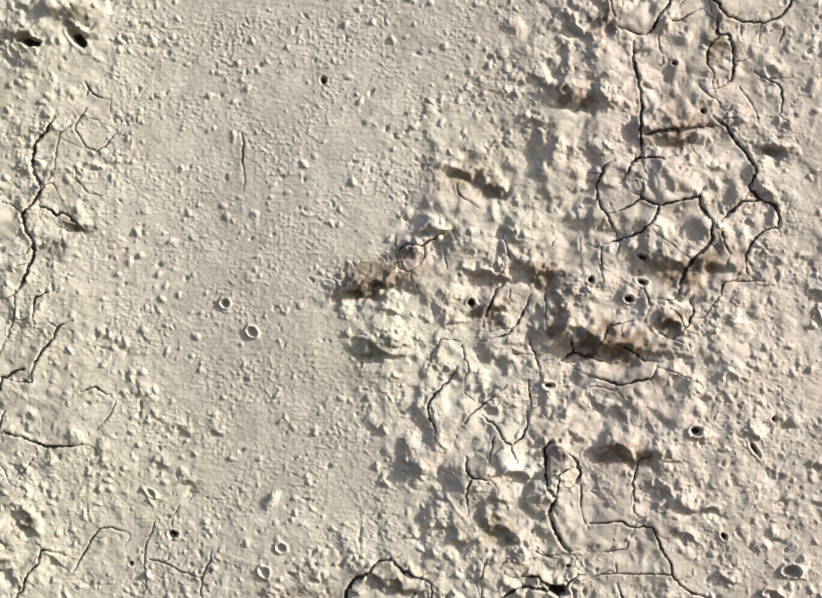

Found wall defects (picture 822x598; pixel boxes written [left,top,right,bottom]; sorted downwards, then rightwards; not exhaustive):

crack [0,84,125,390]
spalling [340,243,431,294]
crack [395,230,454,288]
crack [426,0,792,517]
crack [0,386,116,488]
crack [16,537,59,597]
crack [77,506,213,595]
crack [344,556,438,598]
crack [475,441,710,598]